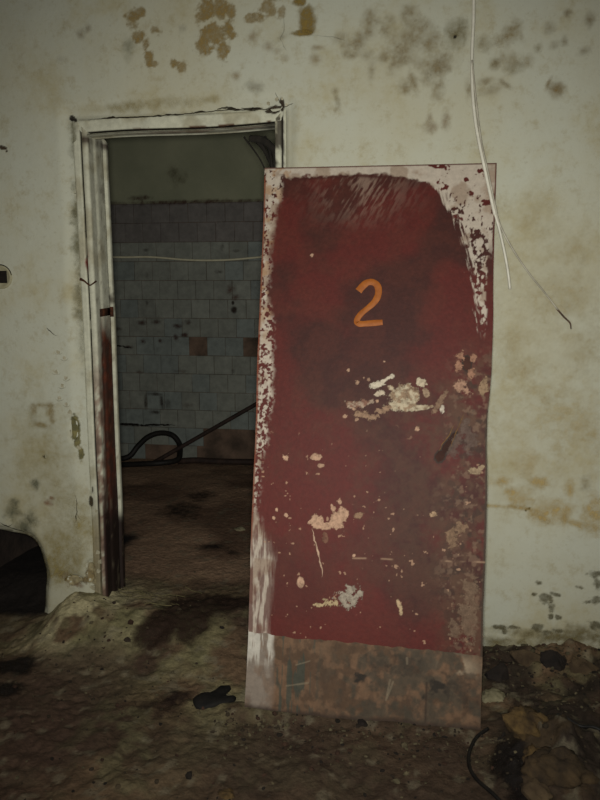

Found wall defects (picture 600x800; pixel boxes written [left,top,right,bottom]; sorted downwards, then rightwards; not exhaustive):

crack [94,93,293,120]
spalling [54,370,85,459]